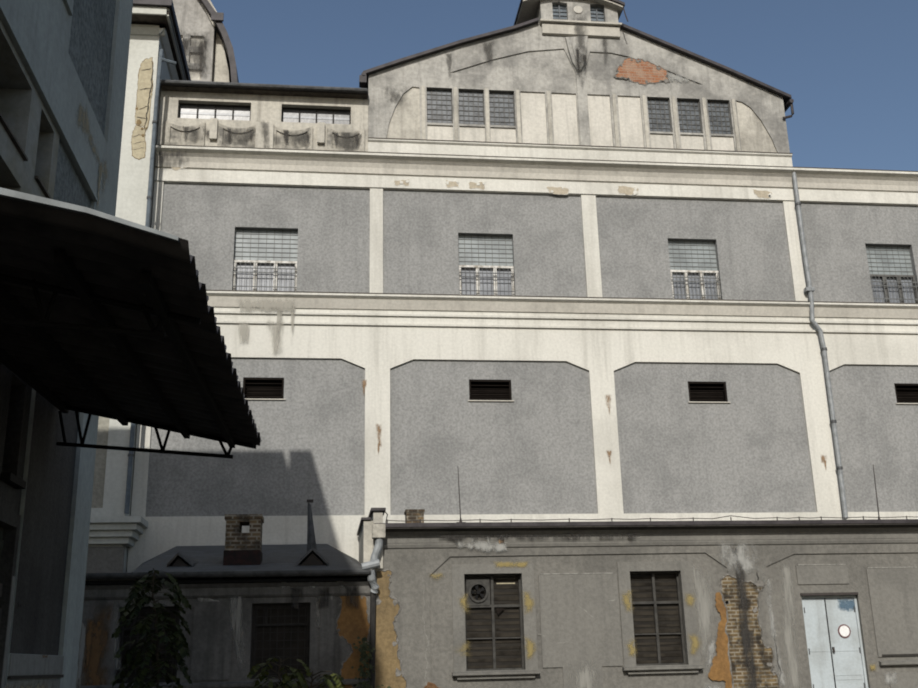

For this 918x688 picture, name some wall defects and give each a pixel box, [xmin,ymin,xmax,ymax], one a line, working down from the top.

peeling [131,57,154,160]
flaking render [613,57,670,86]
peeling [336,569,407,688]
leakage [722,544,756,688]
flaking render [708,573,780,688]